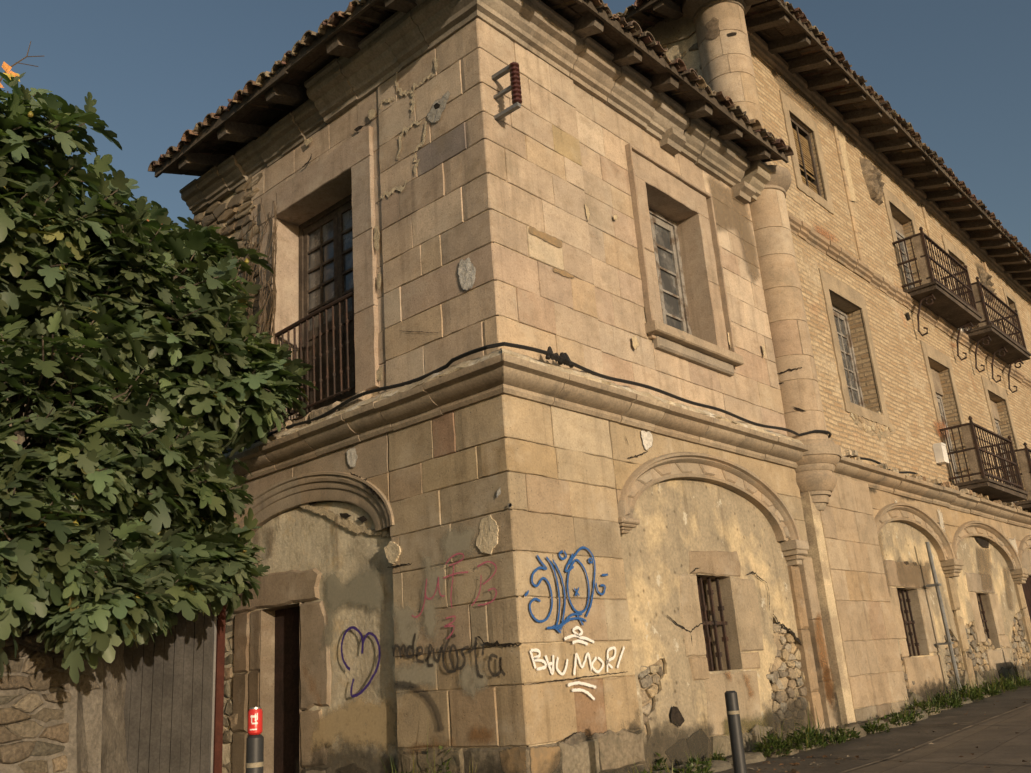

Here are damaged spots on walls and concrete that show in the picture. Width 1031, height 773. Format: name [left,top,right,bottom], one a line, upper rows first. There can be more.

spalling [300,502,401,564]
flaking render [638,664,663,725]
flaking render [766,622,807,726]
flaking render [962,621,995,684]
flaking render [1011,613,1031,670]
water stain [300,745,396,773]